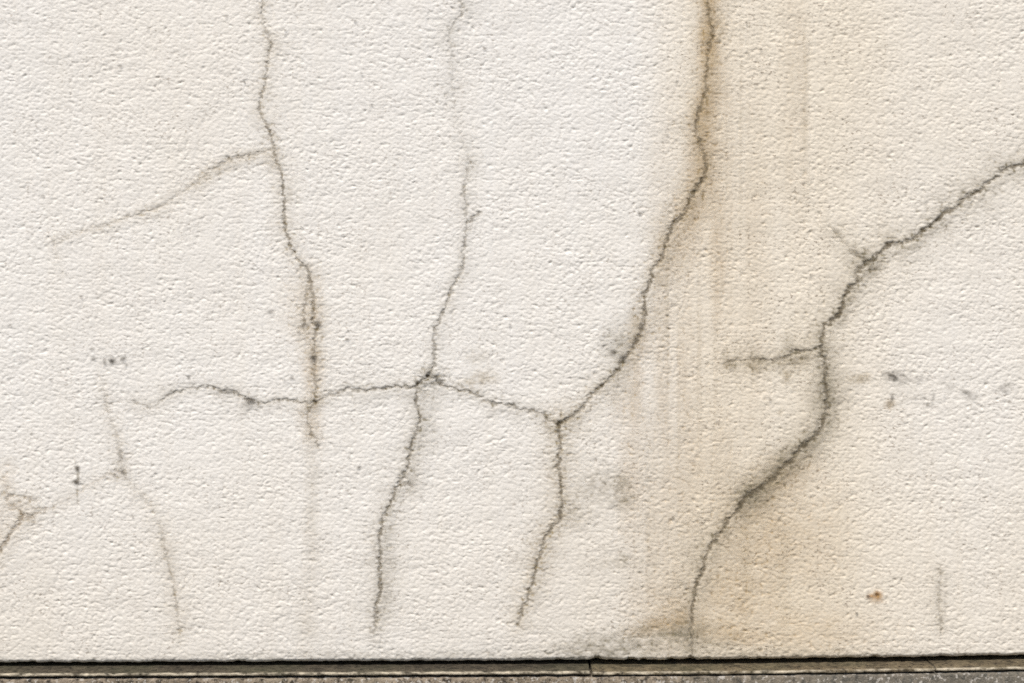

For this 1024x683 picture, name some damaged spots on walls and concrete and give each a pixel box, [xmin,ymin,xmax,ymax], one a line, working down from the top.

crack [516,415,579,625]
crack [691,163,1024,611]